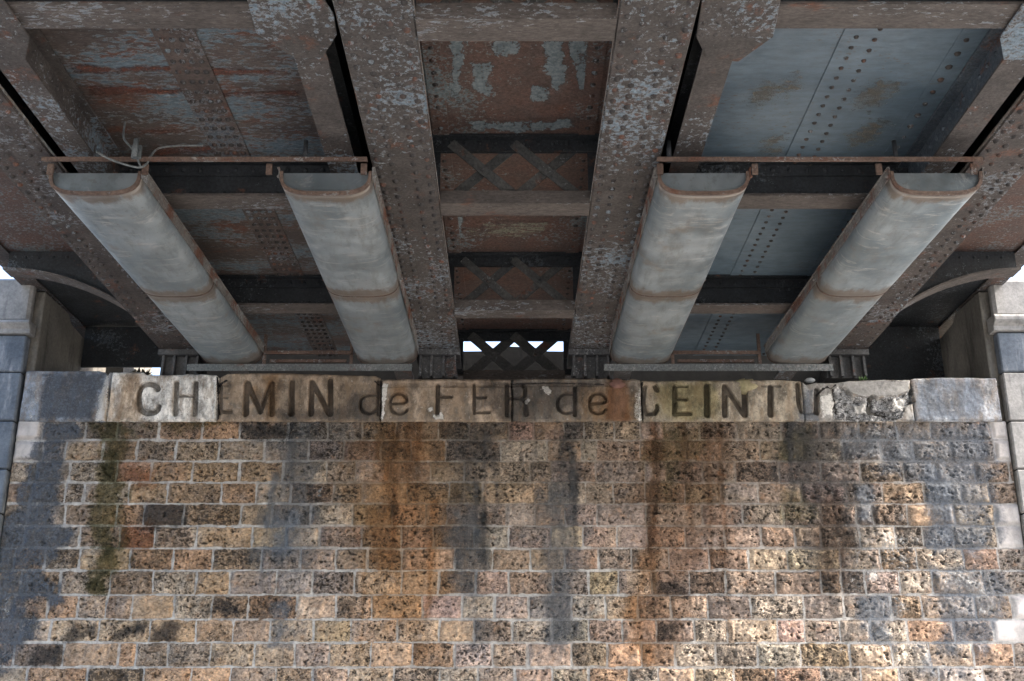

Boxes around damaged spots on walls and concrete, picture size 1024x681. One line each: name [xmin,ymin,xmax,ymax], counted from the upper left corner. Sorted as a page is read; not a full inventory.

rust [69,65,178,96]
peeling [449,41,521,103]
peeling [530,41,587,102]
peeling [468,119,574,134]
spalling [820,386,914,422]